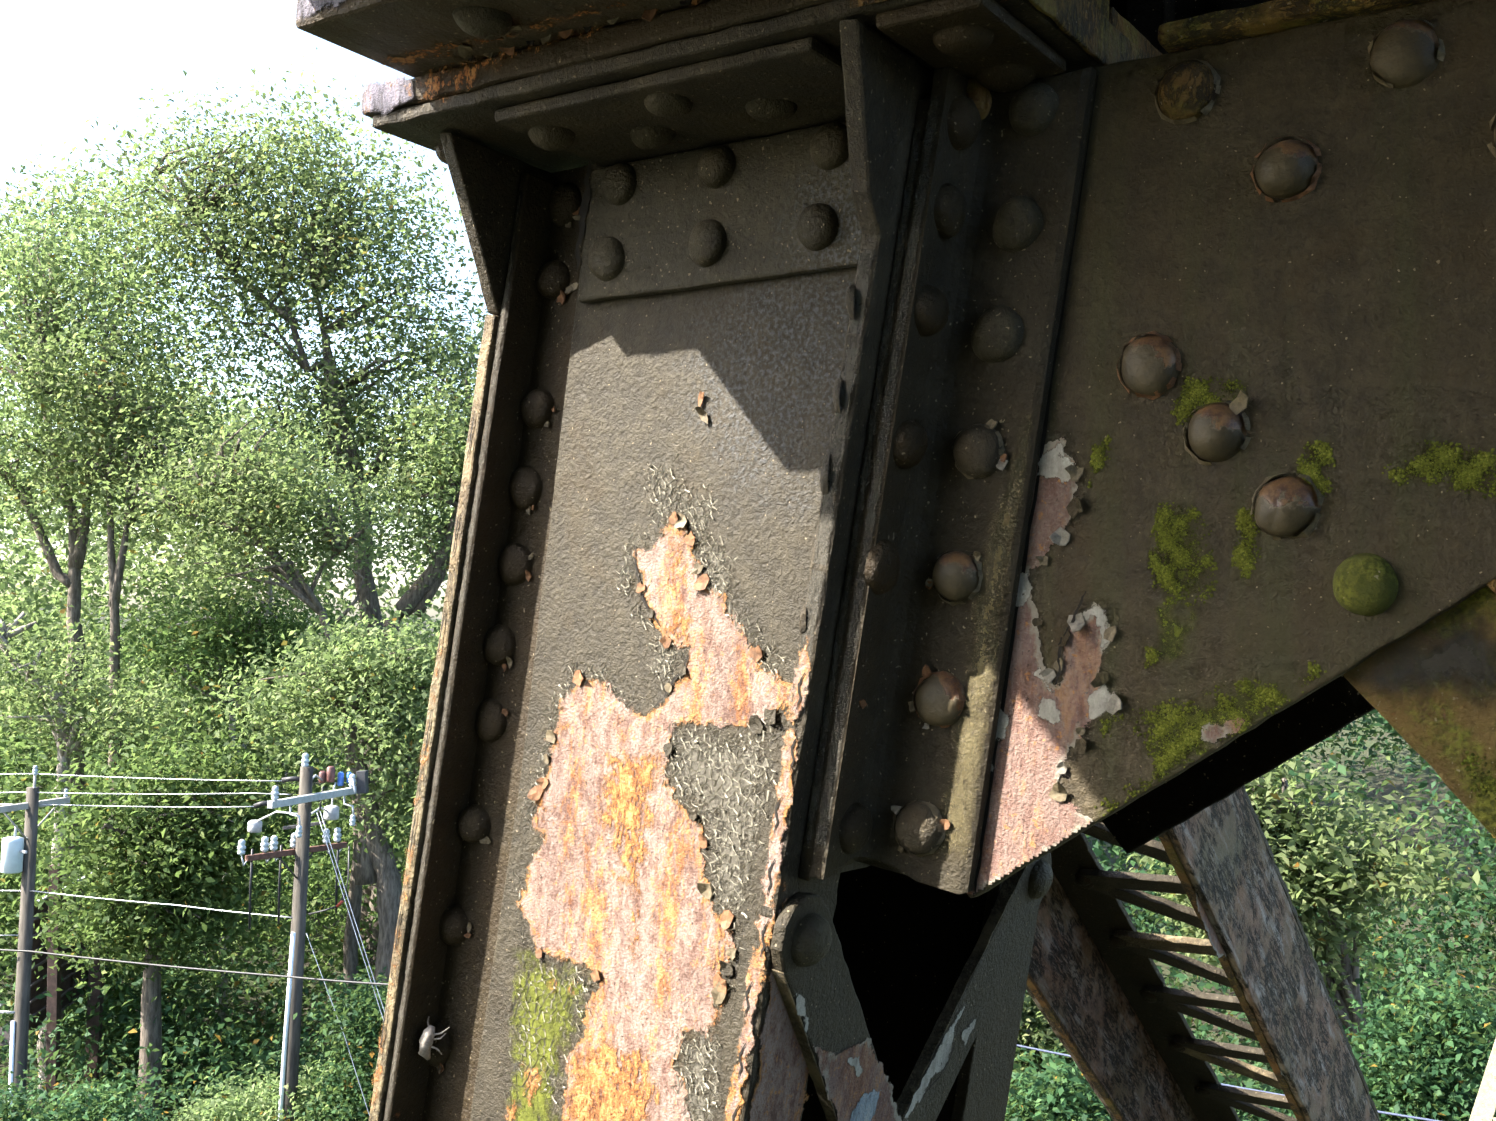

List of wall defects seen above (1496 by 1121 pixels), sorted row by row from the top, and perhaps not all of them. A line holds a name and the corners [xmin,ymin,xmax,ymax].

corrosion [381,1,658,103]
peeling [967,438,1122,895]
leakage [1362,619,1496,699]
corrosion [516,511,811,1121]
corrosion [505,1064,541,1121]
peeling [796,993,976,1121]